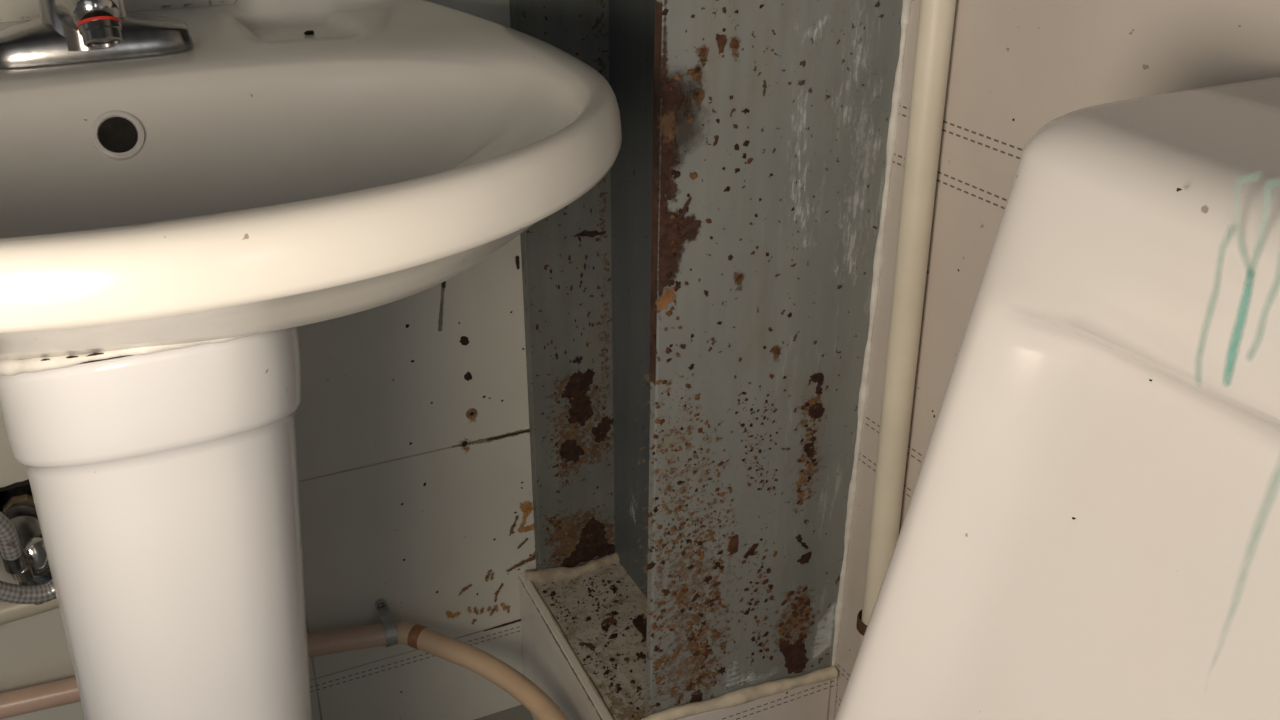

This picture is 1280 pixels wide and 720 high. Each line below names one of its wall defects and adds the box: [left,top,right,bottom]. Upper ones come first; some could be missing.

rust [544,179,609,291]
rust [544,294,613,485]
rust [632,0,825,710]
rust [446,502,615,720]